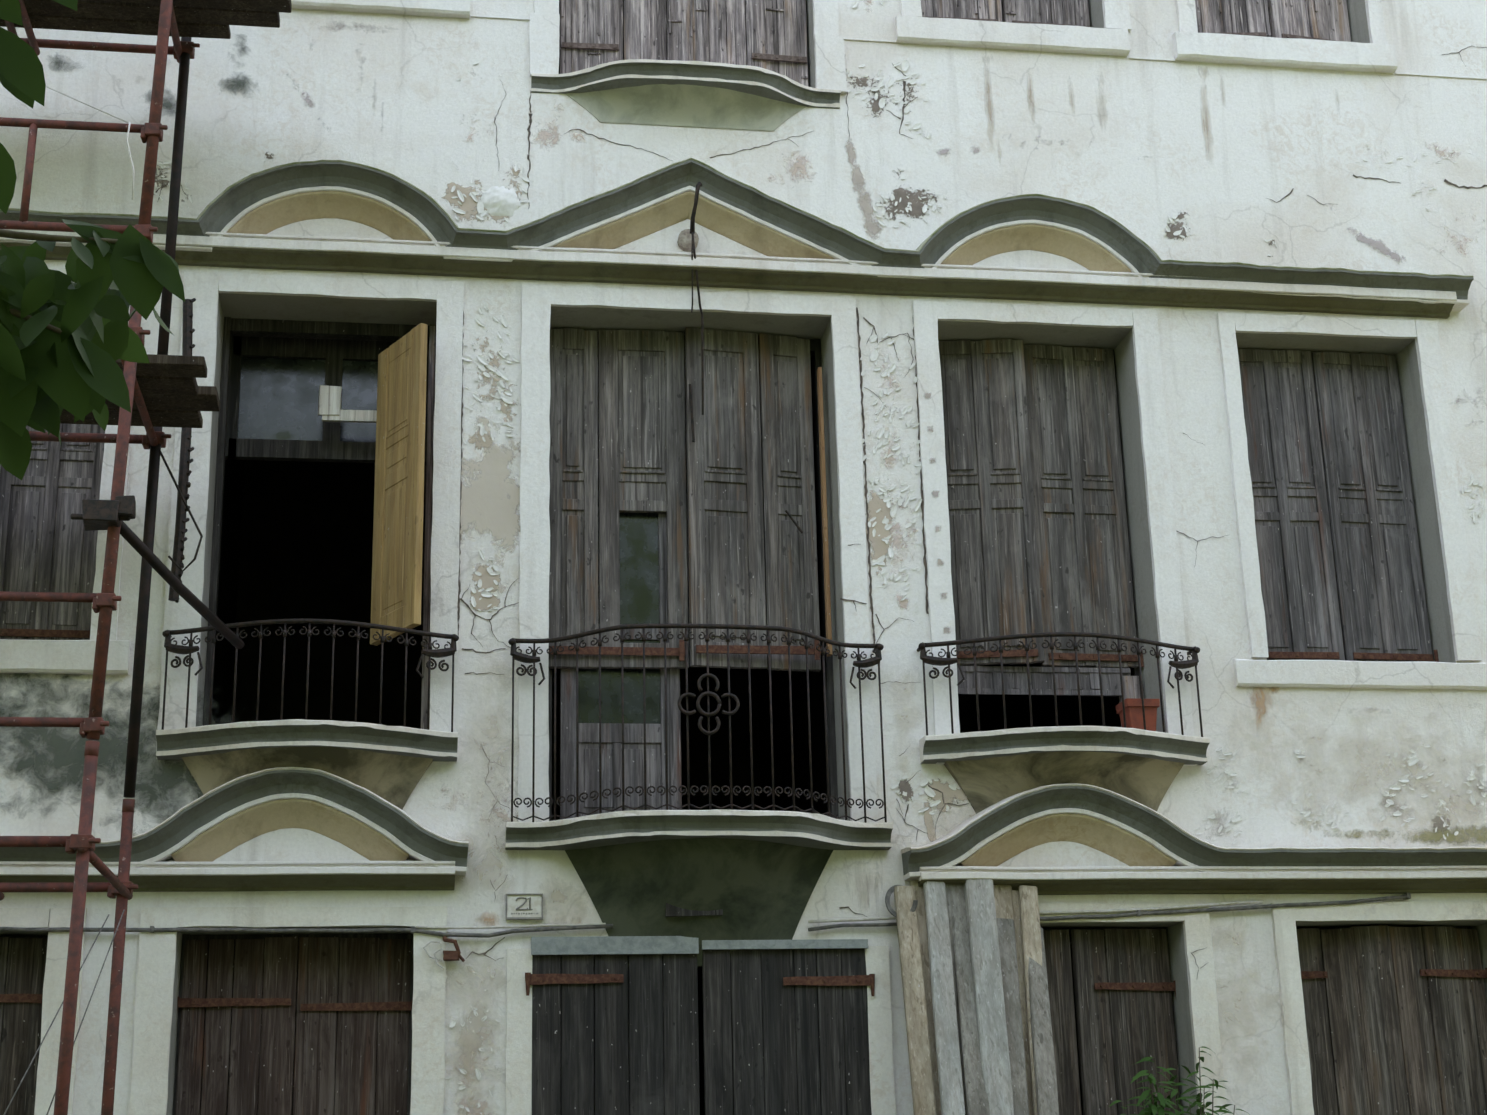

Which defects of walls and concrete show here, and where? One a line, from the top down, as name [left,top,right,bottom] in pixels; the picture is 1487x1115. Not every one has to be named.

spalling [442,164,531,227]
crack [494,79,672,209]
water stain [0,157,1474,319]
crack [710,131,813,158]
crack [846,79,881,237]
peeling [846,60,932,139]
crack [887,63,917,139]
spalling [873,169,947,228]
spalling [1164,210,1193,240]
peeling [460,306,521,611]
peeling [860,331,922,612]
peeling [1372,744,1487,840]